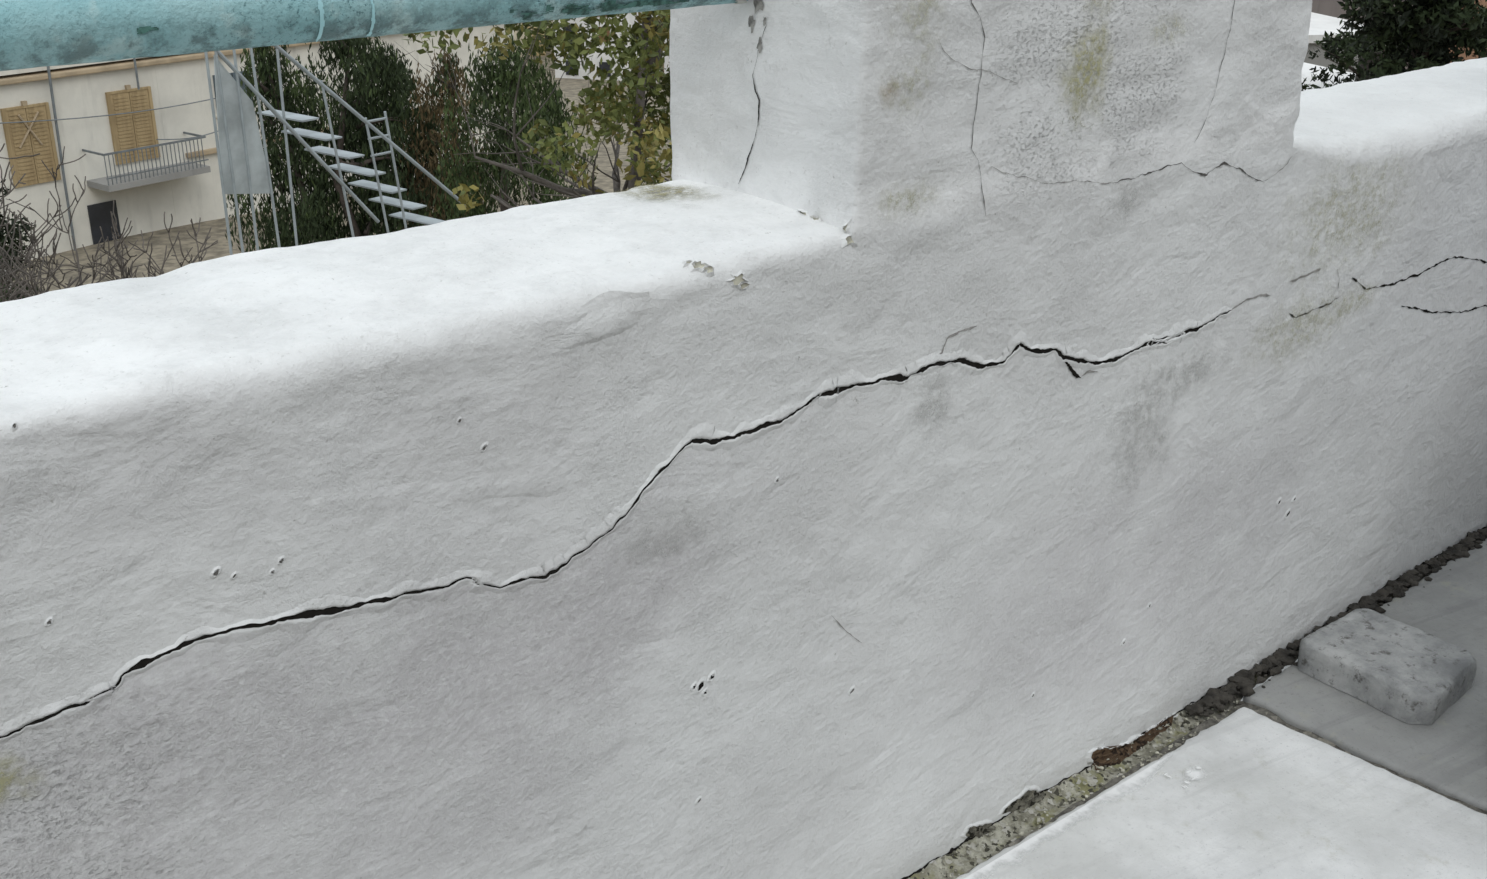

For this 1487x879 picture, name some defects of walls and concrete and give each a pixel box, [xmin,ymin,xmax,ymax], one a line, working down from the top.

crack [738,27,766,184]
crack [937,0,1290,215]
crack [0,256,1487,744]